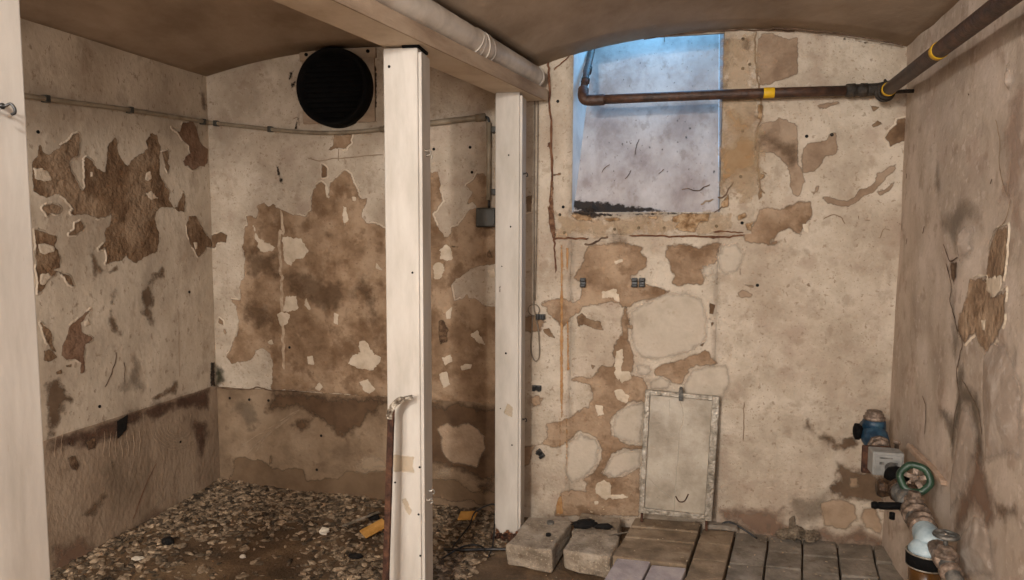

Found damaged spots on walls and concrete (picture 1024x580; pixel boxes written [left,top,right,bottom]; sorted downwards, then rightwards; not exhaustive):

peeling [38,307,94,374]
peeling [32,131,227,296]
damp [47,362,223,448]
peeling [170,121,208,172]
damp [194,422,206,457]
peeling [218,163,387,396]
damp [269,393,388,437]
peeling [430,171,495,403]
peeling [524,242,721,517]
peeling [738,104,896,245]
peeling [956,222,1010,355]